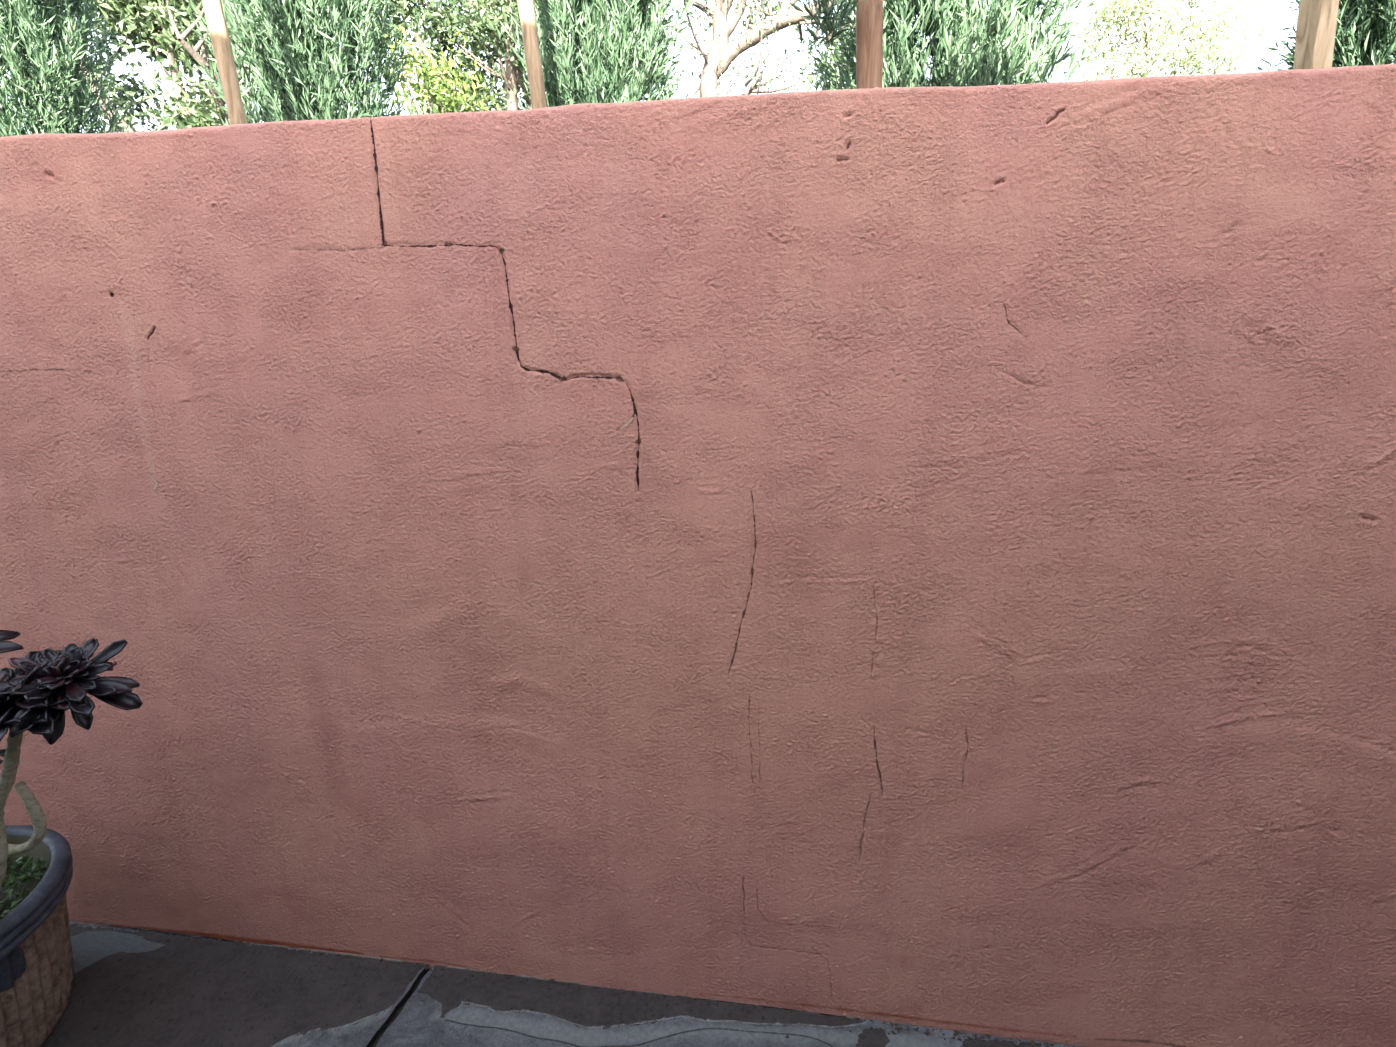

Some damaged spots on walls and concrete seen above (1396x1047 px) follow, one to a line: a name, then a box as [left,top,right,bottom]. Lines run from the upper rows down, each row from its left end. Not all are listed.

crack [370,117,641,491]
crack [729,491,757,671]